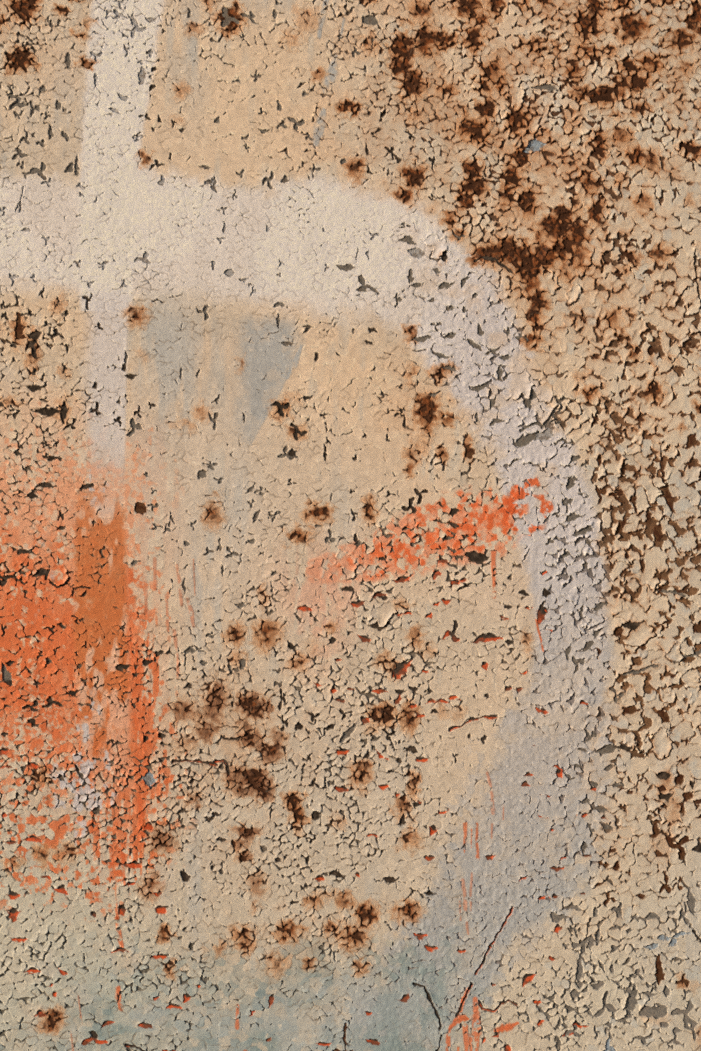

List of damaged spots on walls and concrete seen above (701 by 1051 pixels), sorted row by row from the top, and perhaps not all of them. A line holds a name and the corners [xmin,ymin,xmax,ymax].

rust [0,0,101,86]
crack [0,0,185,352]
peeling [133,111,184,142]
rust [356,0,701,354]
crack [0,340,77,515]
rust [162,582,349,838]
crack [162,0,701,1051]
peeling [425,558,471,618]
peeling [566,587,701,674]
peeling [683,434,701,477]
crack [0,562,326,1051]
rust [200,821,429,985]